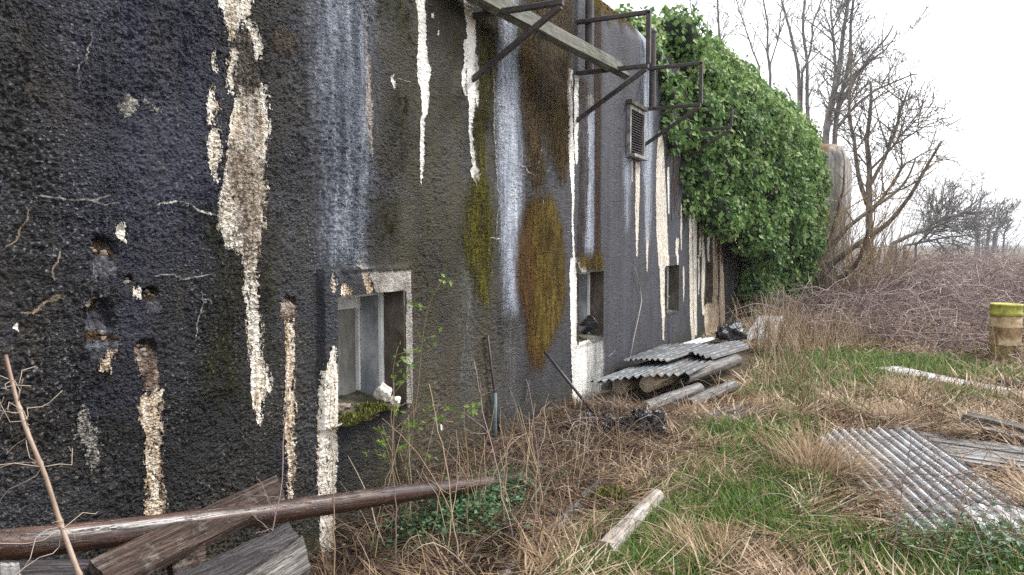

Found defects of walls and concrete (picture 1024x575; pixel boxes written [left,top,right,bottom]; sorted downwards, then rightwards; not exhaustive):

damp [311,0,373,267]
peeling [416,0,439,184]
peeling [461,0,481,185]
spalling [89,222,160,314]
peeling [206,0,298,499]
peeling [631,130,725,340]
peeling [134,338,169,516]
peeling [314,346,343,495]
peeling [318,514,336,562]